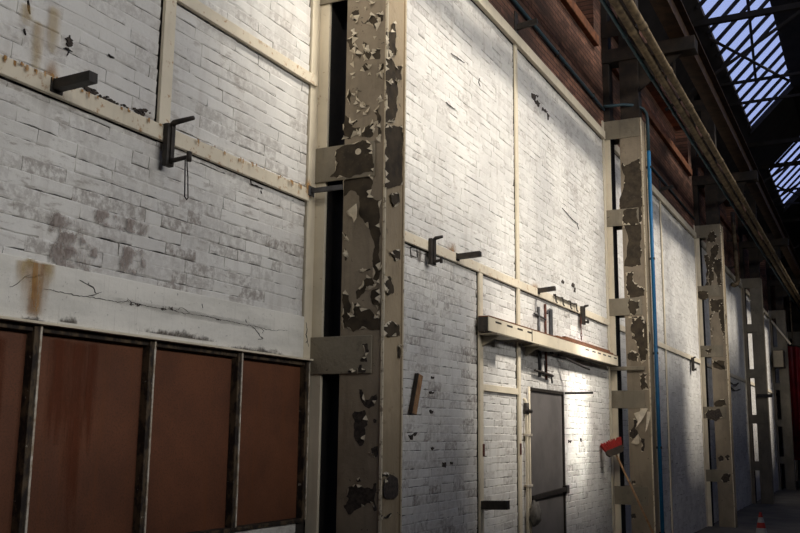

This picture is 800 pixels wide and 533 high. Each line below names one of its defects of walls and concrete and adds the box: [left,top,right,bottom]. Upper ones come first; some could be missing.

corrosion [4,55,58,80]
peeling [330,0,404,359]
corrosion [29,262,46,313]
crack [47,280,285,340]
peeling [619,158,651,390]
peeling [698,231,727,340]
peeling [705,349,727,370]
peeling [352,389,378,457]
peeling [629,408,651,452]
peeling [705,399,726,421]
peeling [344,471,400,520]